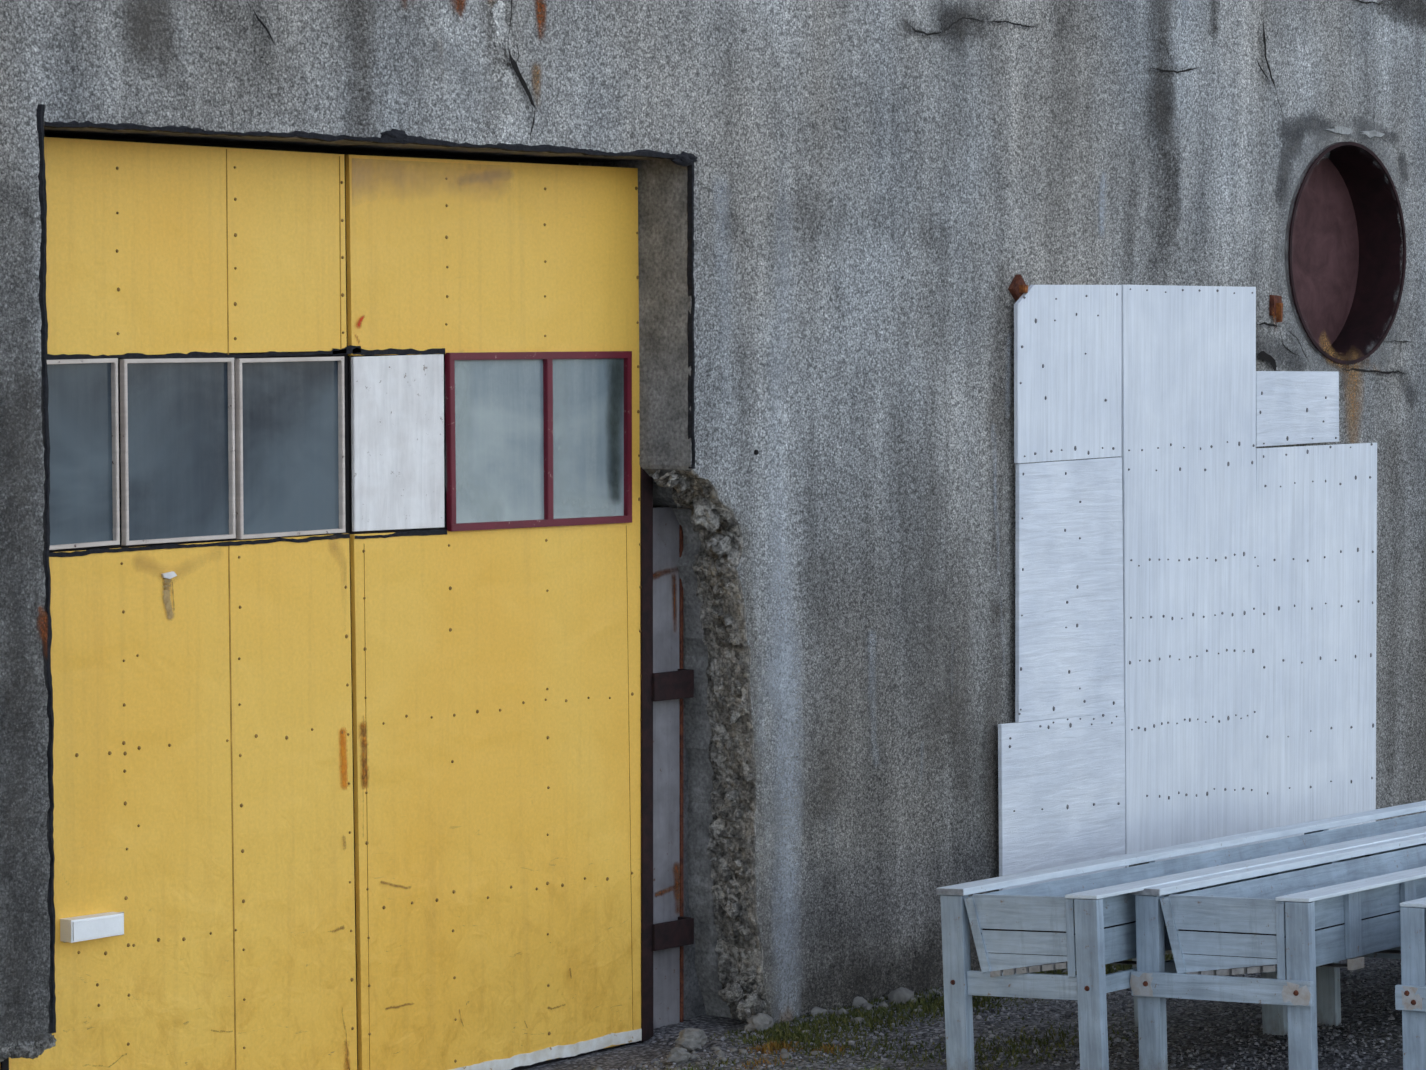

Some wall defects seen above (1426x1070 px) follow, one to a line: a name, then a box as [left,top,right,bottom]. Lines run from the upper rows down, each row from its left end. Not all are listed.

crack [508,0,536,139]
rust [536,0,546,37]
crack [910,17,1035,36]
crack [1150,37,1196,73]
crack [1257,24,1284,124]
leakage [1148,0,1177,259]
rust [1321,335,1369,437]
spalling [649,470,778,1022]